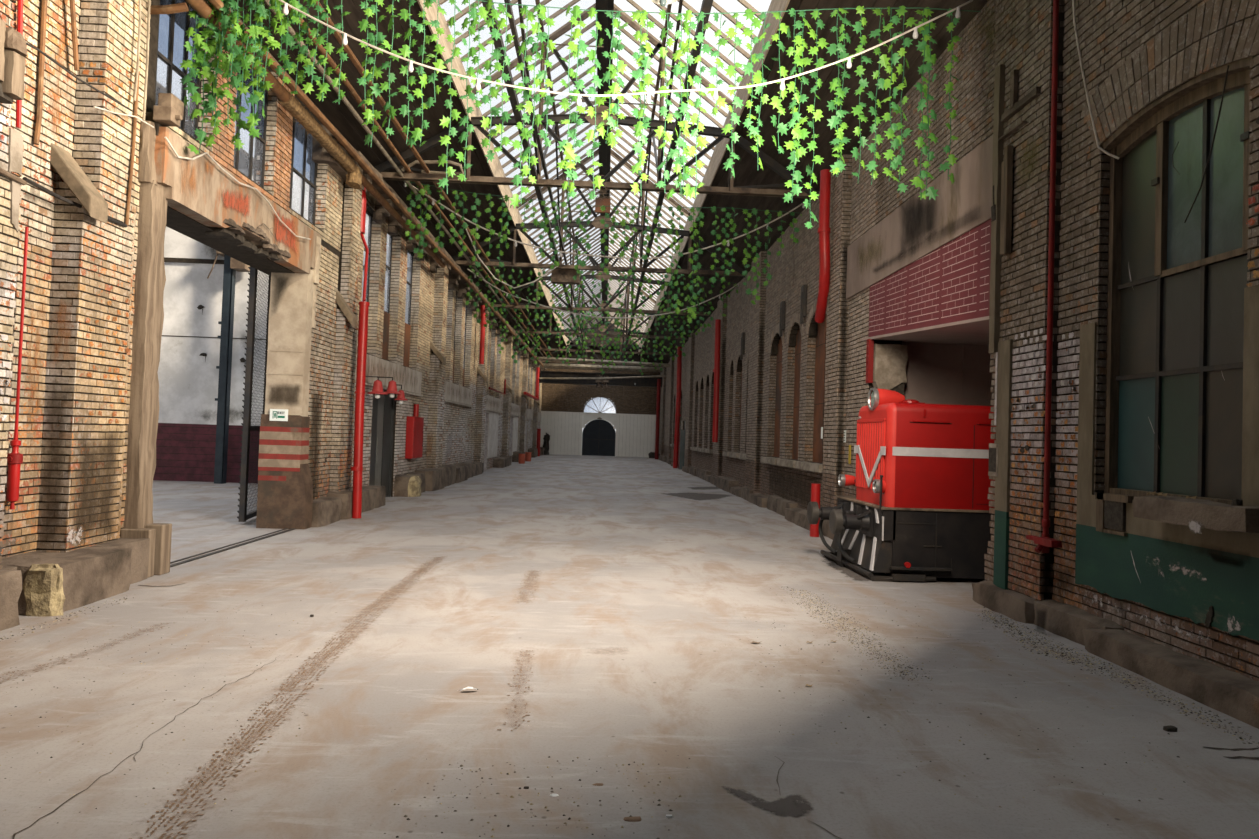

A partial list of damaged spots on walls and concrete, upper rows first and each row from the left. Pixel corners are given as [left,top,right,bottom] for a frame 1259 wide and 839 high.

crack [13,658,276,839]
damp [725,788,813,818]